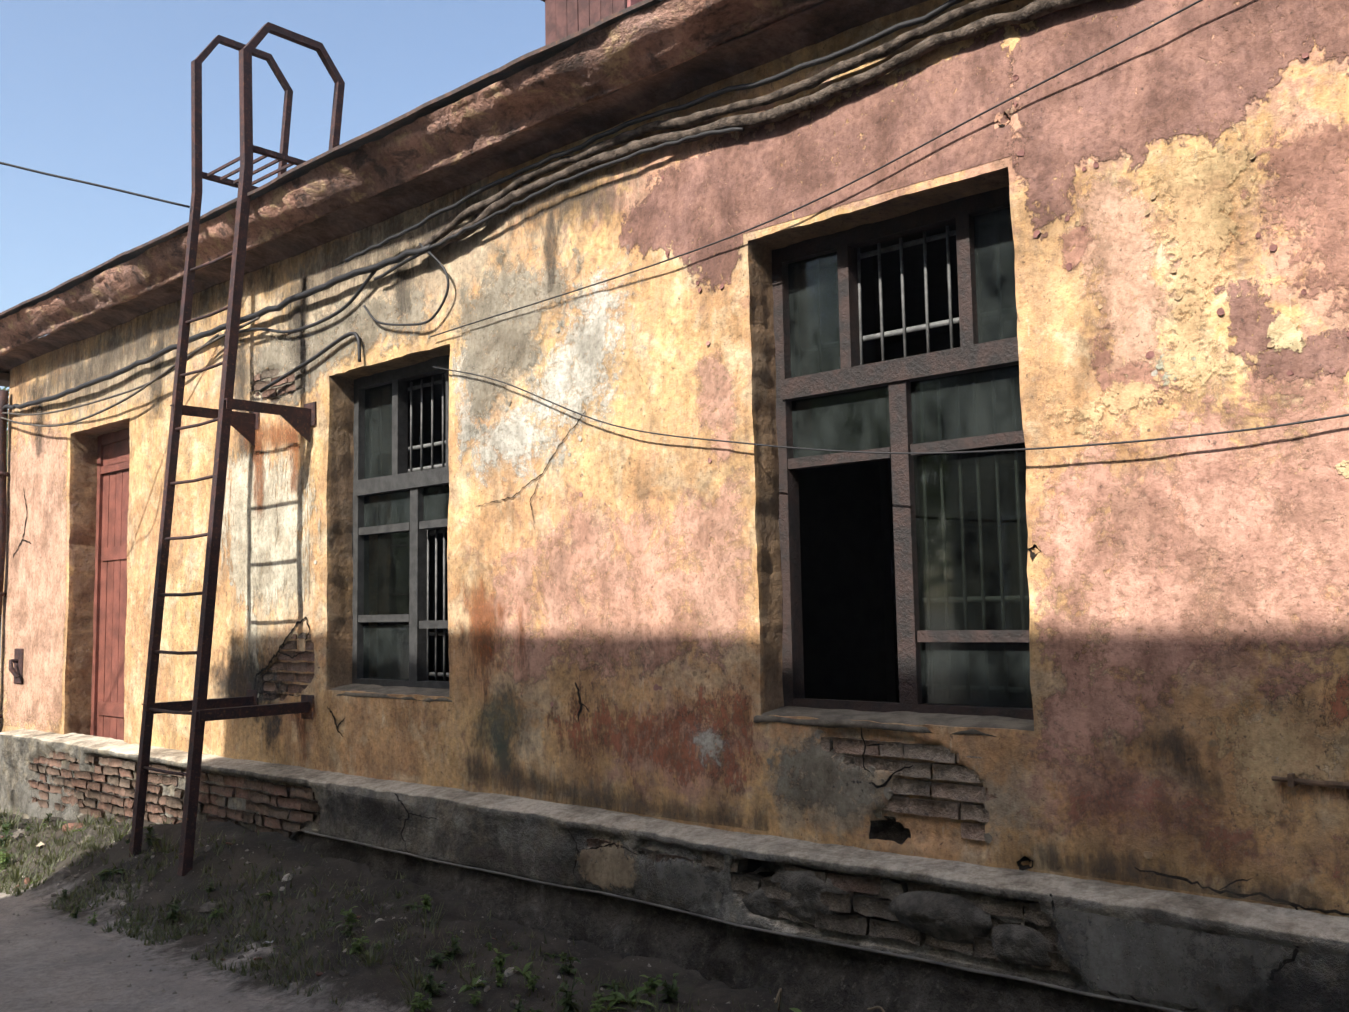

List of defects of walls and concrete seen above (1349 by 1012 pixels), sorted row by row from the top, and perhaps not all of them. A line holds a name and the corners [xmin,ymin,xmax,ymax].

crack [476,411,586,520]
flaking render [452,241,628,488]
peeling [618,0,1349,847]
peeling [0,419,69,731]
flaking render [220,445,322,701]
peeling [486,341,762,795]
flaking render [28,750,330,838]
leakage [467,689,762,829]
flaking render [586,838,1081,977]
crack [1136,868,1260,898]
crack [1255,946,1299,980]
crack [1290,902,1349,916]